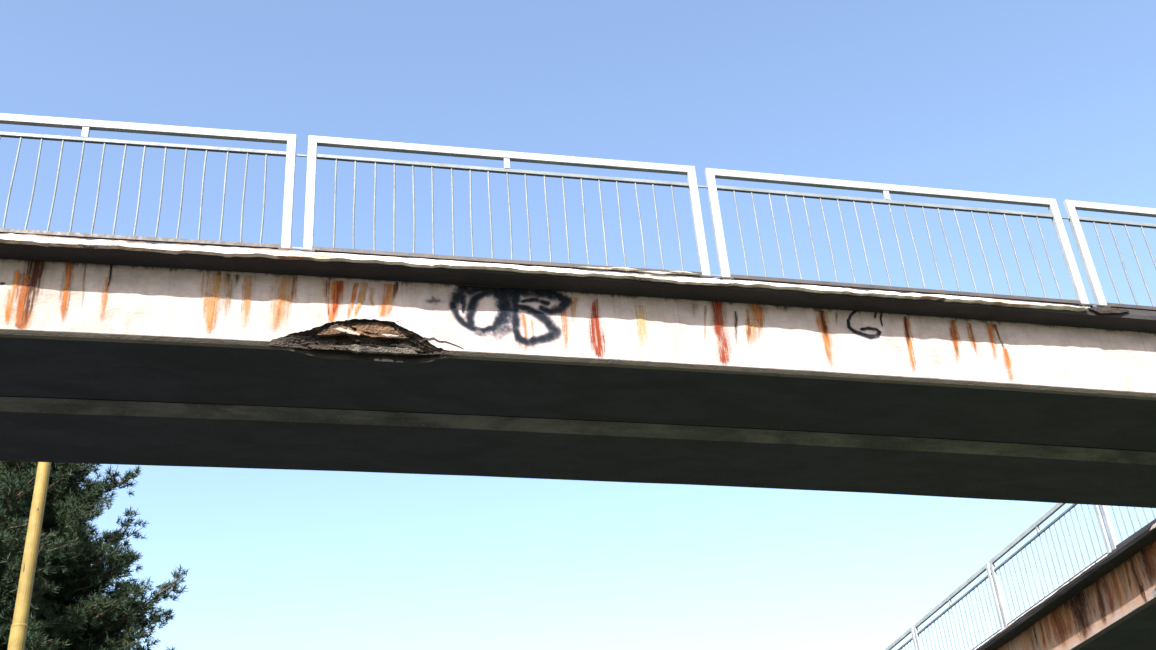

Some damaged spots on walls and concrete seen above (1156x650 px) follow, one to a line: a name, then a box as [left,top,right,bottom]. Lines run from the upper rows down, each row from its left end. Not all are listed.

rust [6,260,46,328]
rust [59,262,86,314]
rust [201,271,252,328]
rust [270,276,297,323]
rust [323,280,398,321]
spalling [270,320,453,356]
rust [589,299,605,357]
rust [693,301,766,363]
rust [817,311,838,360]
rust [903,316,916,369]
rust [950,320,976,352]
rust [986,323,1012,379]